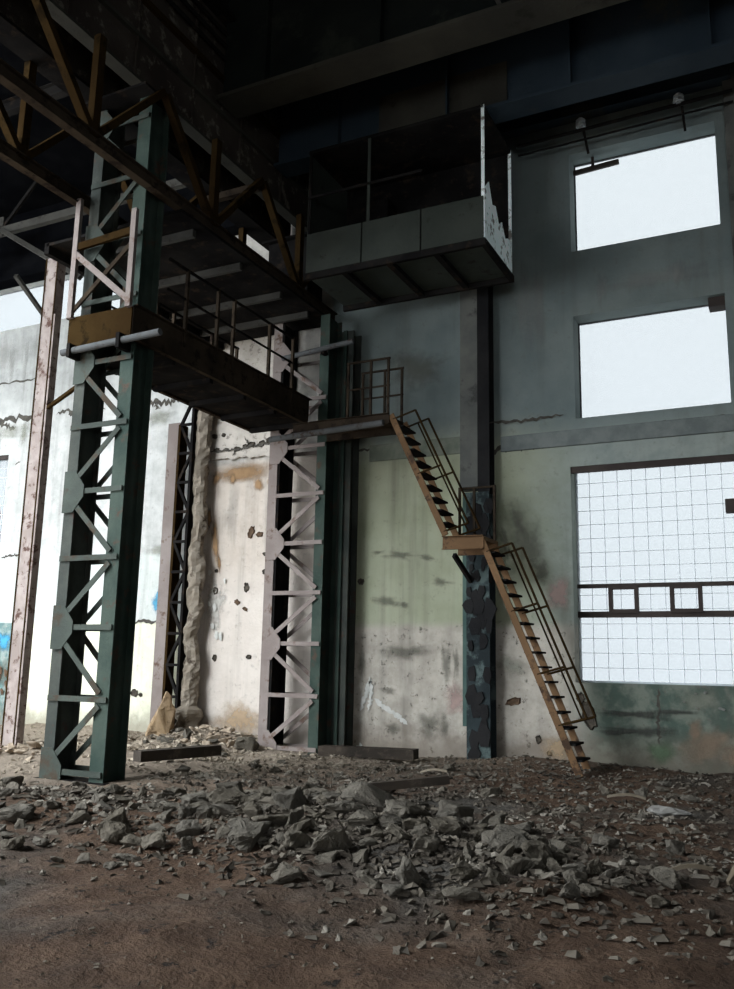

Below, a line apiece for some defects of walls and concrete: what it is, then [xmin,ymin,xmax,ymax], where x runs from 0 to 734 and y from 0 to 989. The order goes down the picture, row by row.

crack [0,377,35,385]
crack [0,413,31,431]
crack [490,414,564,455]
corrosion [213,465,263,490]